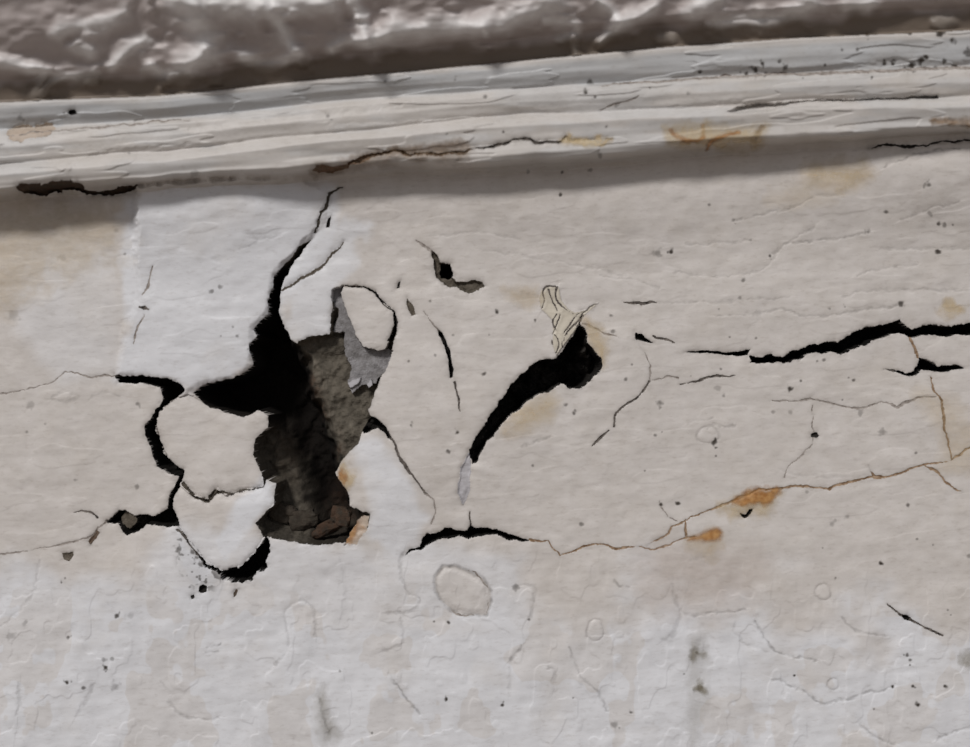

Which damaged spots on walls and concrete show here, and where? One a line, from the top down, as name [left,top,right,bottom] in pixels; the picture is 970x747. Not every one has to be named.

crack [16,180,138,196]
crack [312,134,612,233]
crack [871,139,970,149]
flaking render [107,240,436,597]
flaking render [457,285,617,526]
crack [406,311,970,556]
corrosion [689,529,721,541]
corrosion [733,487,779,507]